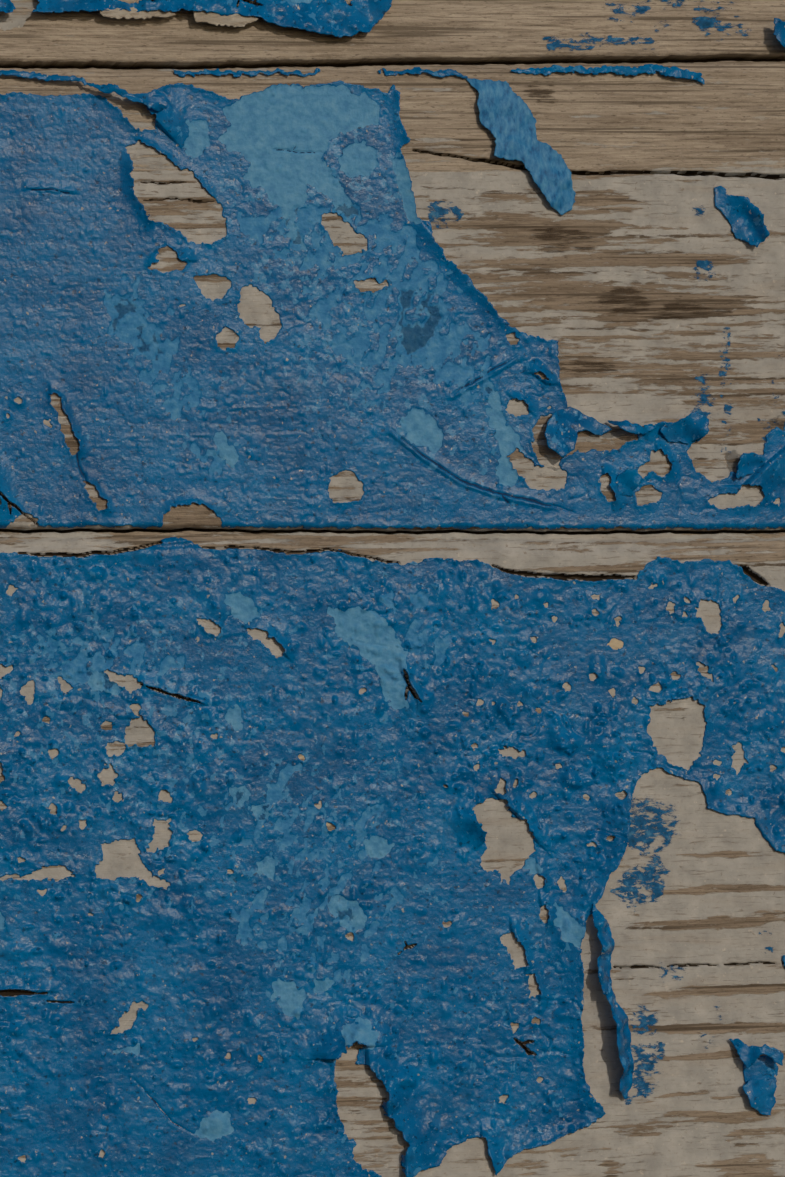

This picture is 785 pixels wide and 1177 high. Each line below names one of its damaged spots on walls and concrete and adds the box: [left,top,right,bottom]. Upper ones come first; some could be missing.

peeling [99,0,176,20]
peeling [193,11,258,27]
peeling [0,68,380,256]
peeling [354,64,785,509]
peeling [104,246,282,421]
peeling [43,393,80,455]
peeling [328,470,364,503]
crack [401,437,551,506]
peeling [95,818,173,902]
peeling [220,754,404,1019]
peeling [334,672,785,1177]
peeling [111,1001,148,1034]